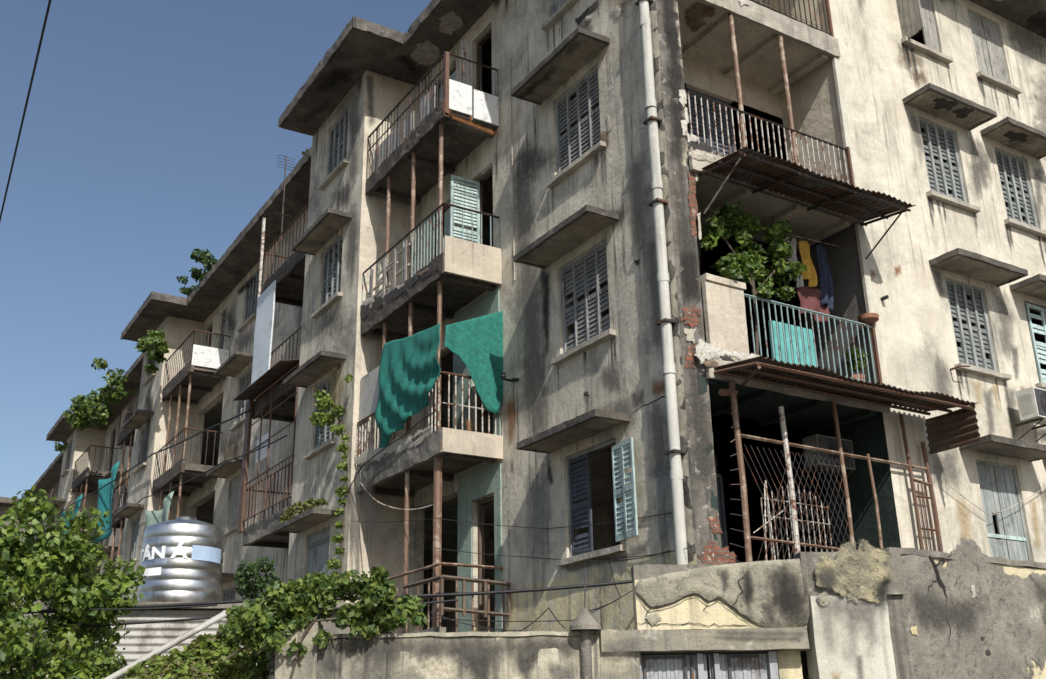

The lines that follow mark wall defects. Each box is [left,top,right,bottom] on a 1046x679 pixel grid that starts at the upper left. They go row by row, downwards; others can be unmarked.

peeling [409,40,440,66]
peeling [438,11,464,35]
damp [902,44,925,82]
damp [516,149,544,252]
damp [613,156,659,346]
damp [972,143,989,193]
damp [521,264,549,428]
spalling [681,306,758,368]
spalling [354,426,432,466]
damp [650,409,672,533]
spalling [636,515,876,629]
flaking render [901,537,1046,679]